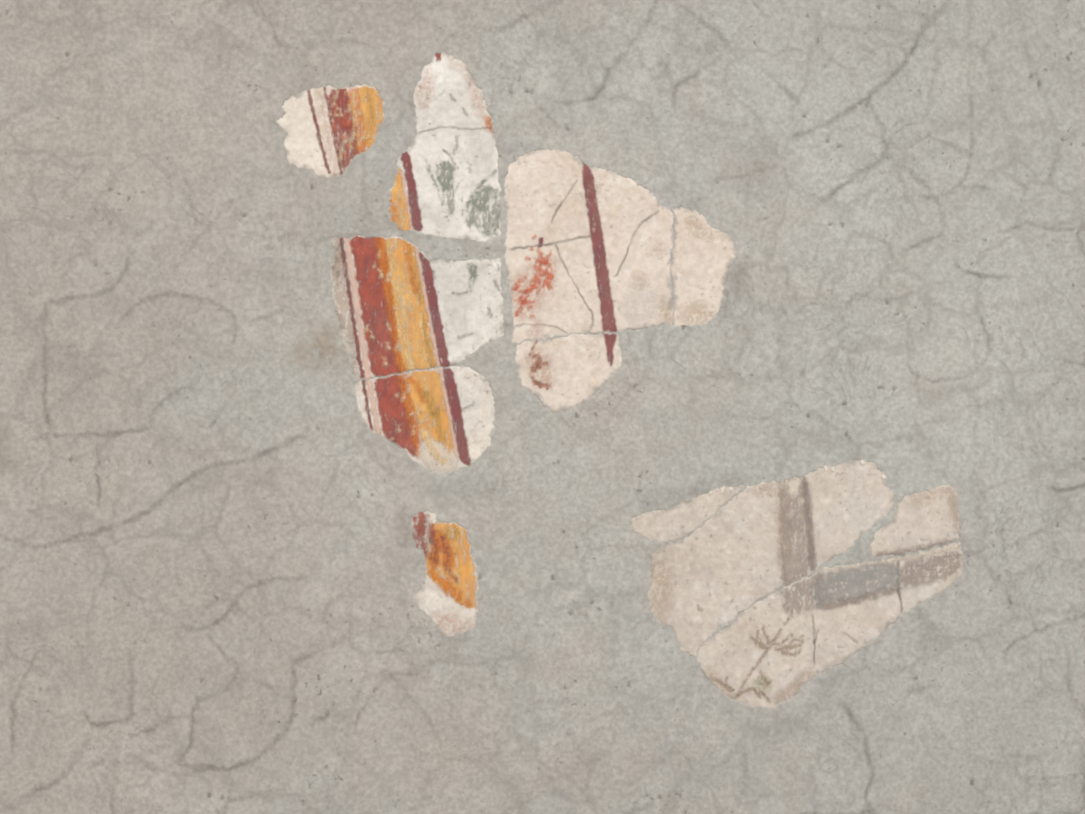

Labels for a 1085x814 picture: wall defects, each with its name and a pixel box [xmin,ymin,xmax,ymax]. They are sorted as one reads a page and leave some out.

crack [514,204,589,249]